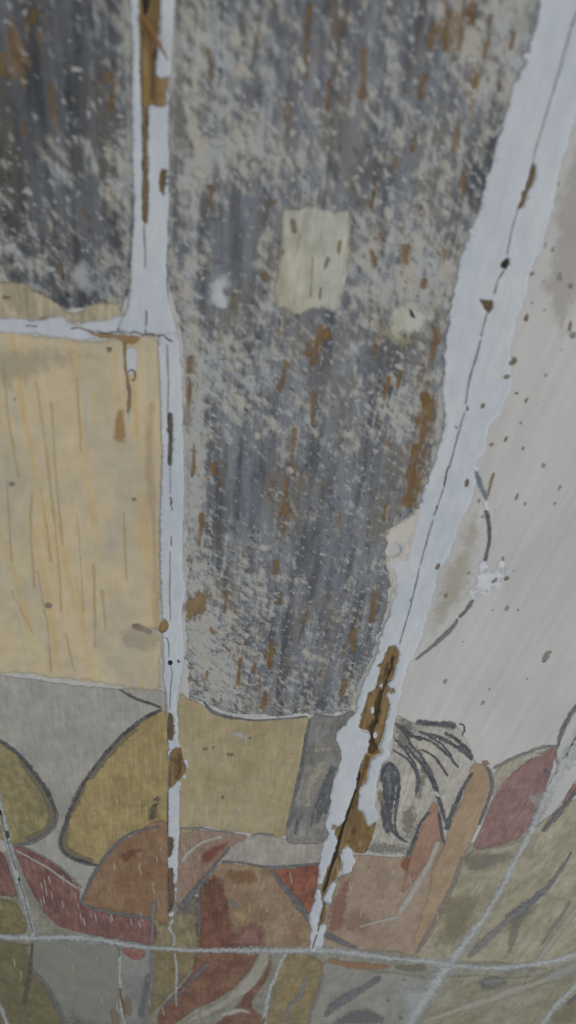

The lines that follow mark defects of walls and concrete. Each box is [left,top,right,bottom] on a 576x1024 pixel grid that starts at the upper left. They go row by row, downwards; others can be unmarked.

water stain [310,240,342,299]
peeling [157,0,540,717]
spalling [132,619,169,635]
crack [110,987,132,1024]